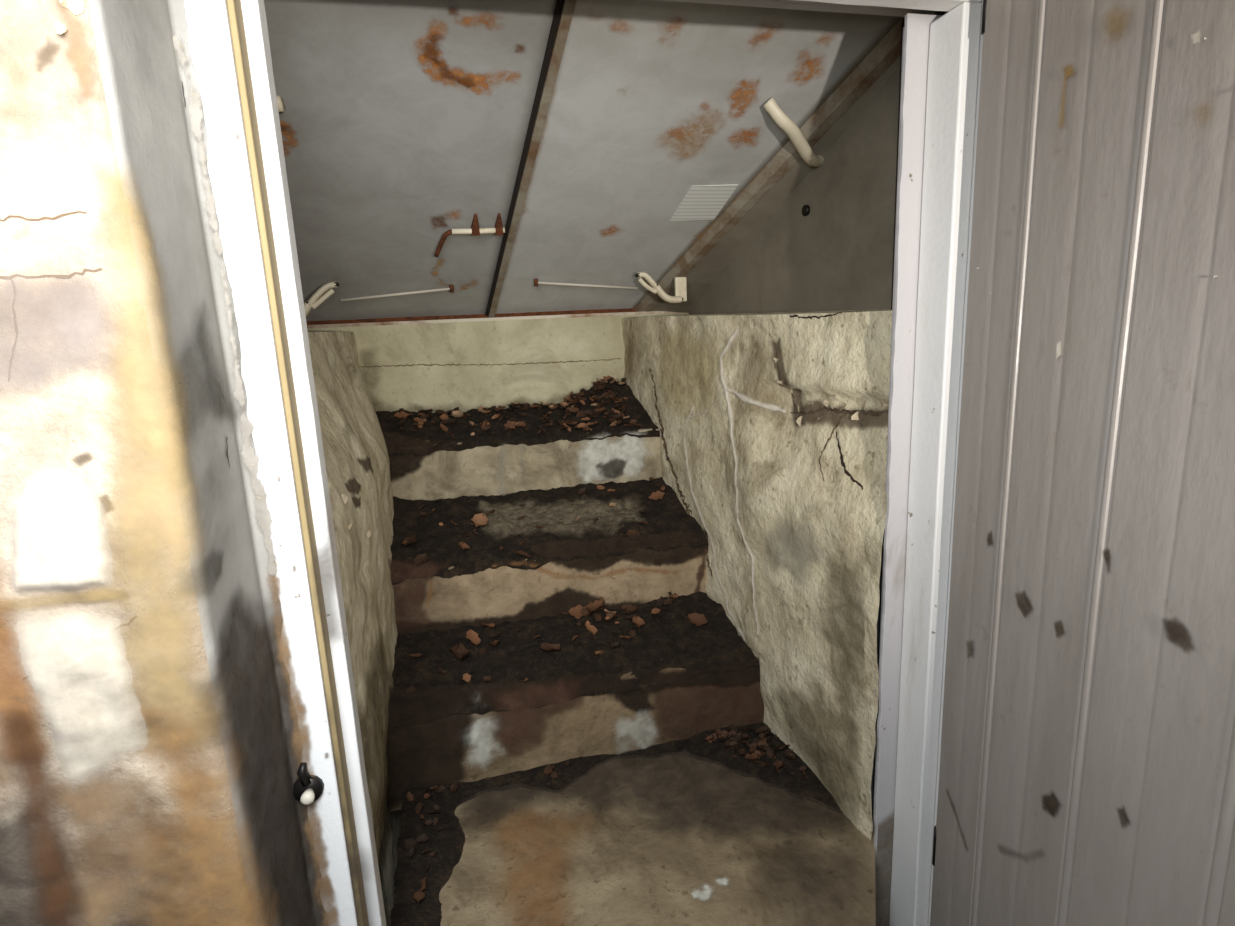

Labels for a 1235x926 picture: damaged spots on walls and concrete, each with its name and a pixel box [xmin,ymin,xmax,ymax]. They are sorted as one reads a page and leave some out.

rust [418,26,518,94]
rust [731,81,755,115]
rust [280,121,296,154]
crack [0,211,87,221]
crack [0,268,102,346]
crack [790,311,842,319]
crack [818,406,883,490]